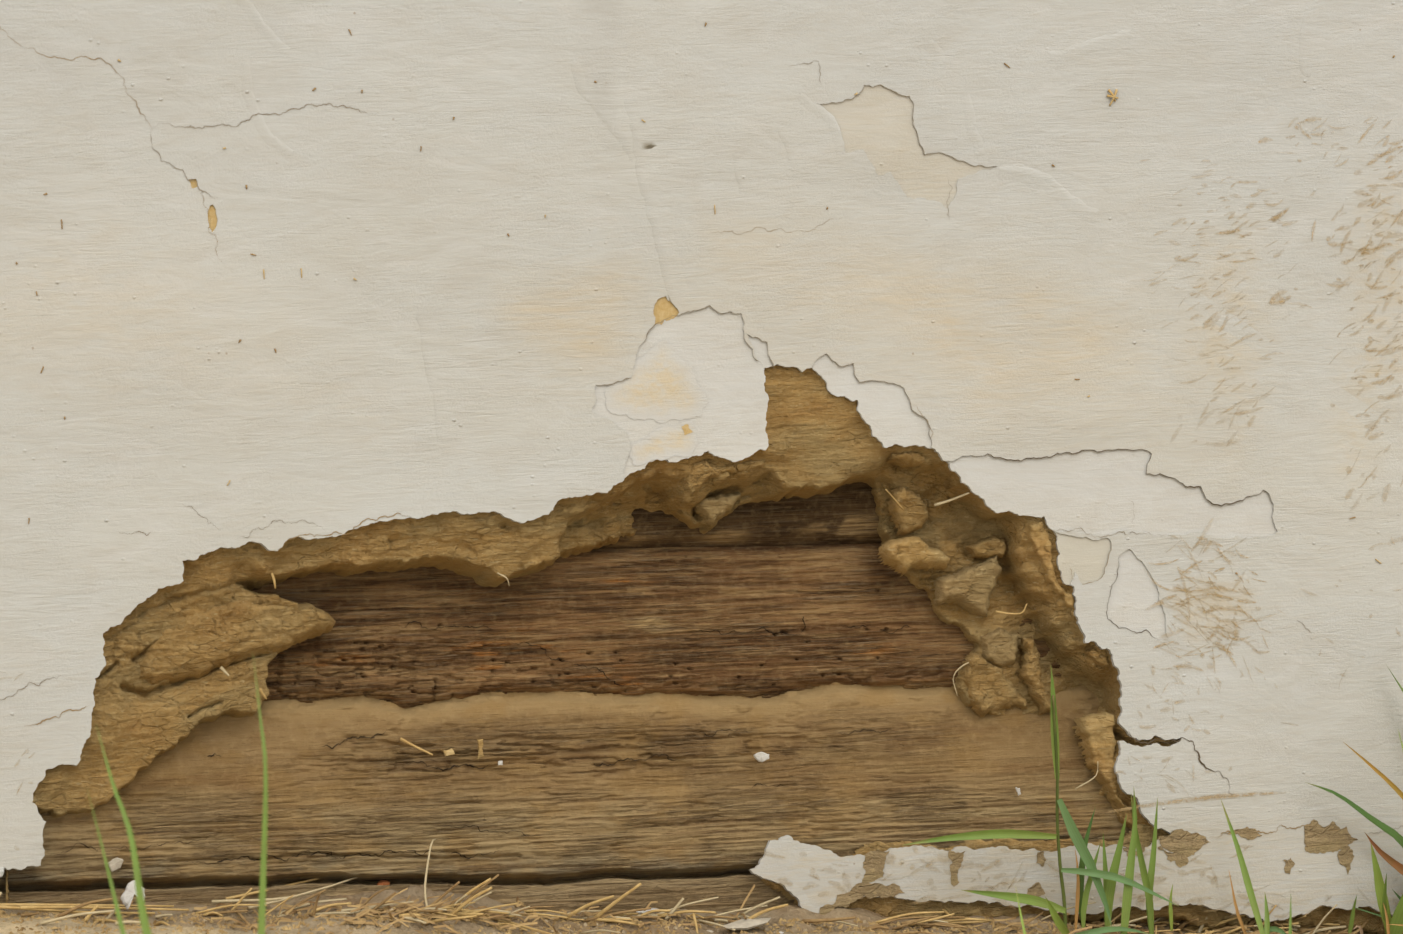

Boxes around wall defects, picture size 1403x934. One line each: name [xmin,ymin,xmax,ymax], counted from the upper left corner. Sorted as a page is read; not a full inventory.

crack [0,28,377,254]
crack [785,60,997,216]
crack [818,354,1274,641]
spalling [33,296,1277,868]
spalling [0,867,9,903]
spalling [108,857,145,910]
spalling [819,849,904,915]
spalling [948,850,965,886]
spalling [1027,851,1046,897]